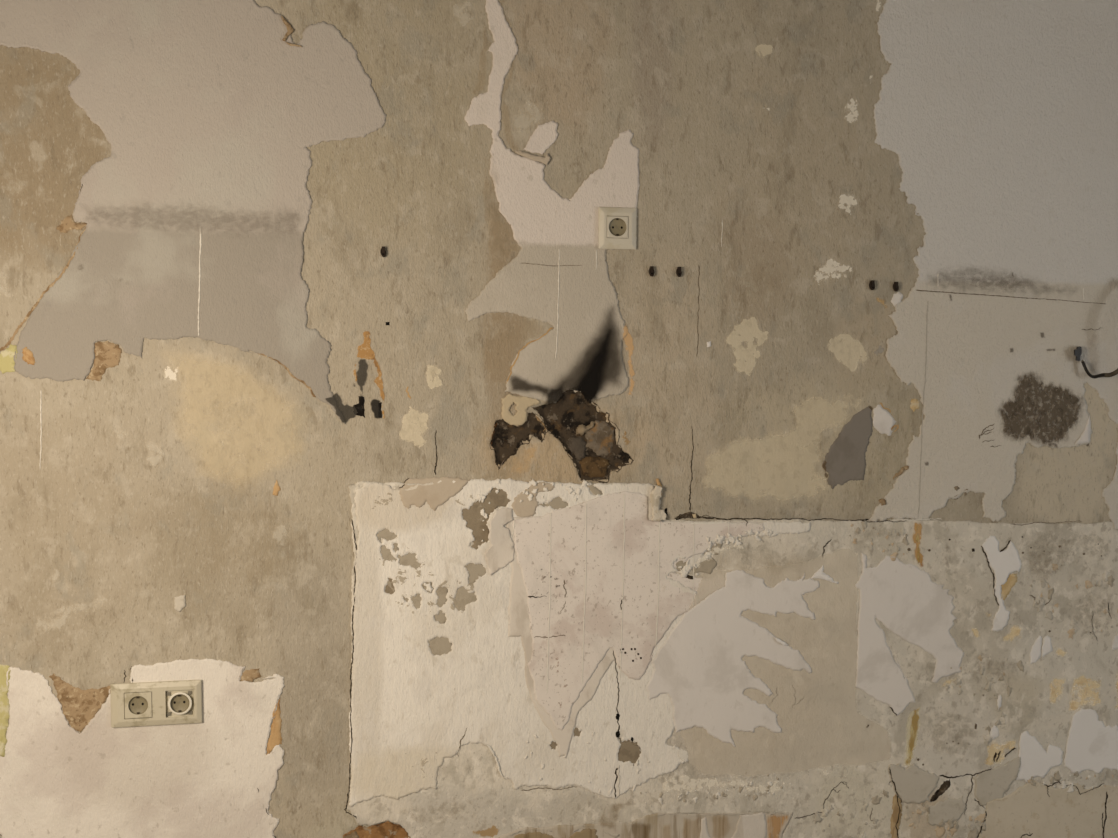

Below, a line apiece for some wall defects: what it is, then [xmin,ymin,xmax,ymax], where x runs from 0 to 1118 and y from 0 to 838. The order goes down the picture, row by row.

leakage [1001,374,1081,446]
flaking render [343,389,1118,838]
crack [613,651,641,797]
crack [796,782,849,818]
crack [863,767,902,838]
crack [940,768,992,838]
crack [1042,782,1108,838]